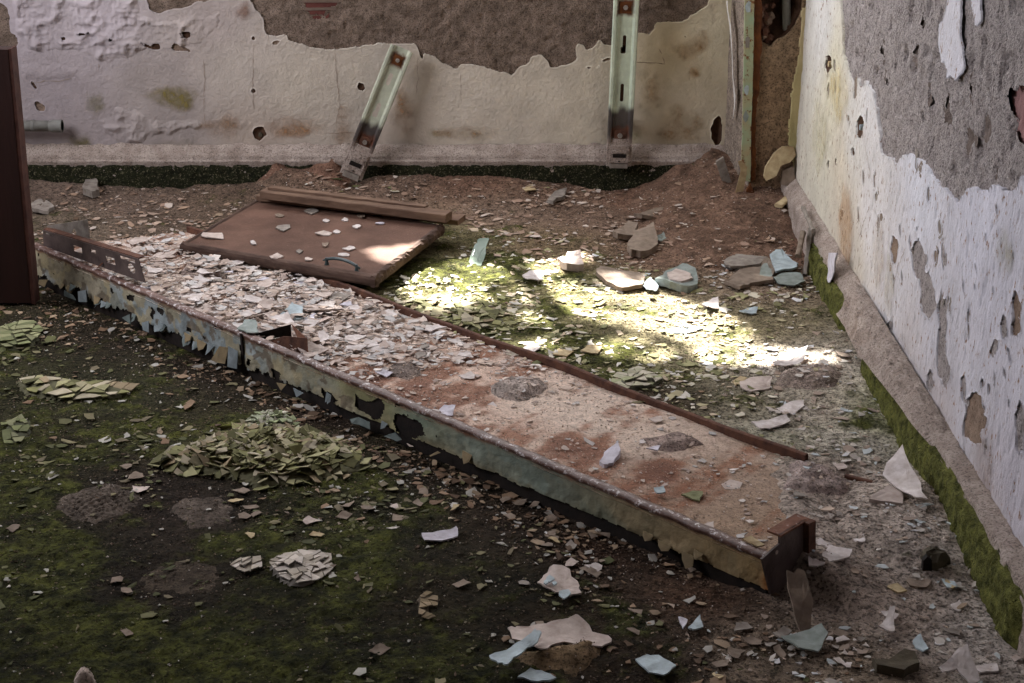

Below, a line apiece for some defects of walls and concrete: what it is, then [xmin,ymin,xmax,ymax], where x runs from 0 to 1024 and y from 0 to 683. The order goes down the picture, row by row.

peeling [638,0,709,34]
peeling [251,0,613,75]
peeling [826,0,1024,201]
peeling [522,270,543,281]
peeling [770,248,798,273]
peeling [121,236,474,378]
spalling [836,213,1005,449]
peeling [523,343,602,357]
peeling [732,376,773,392]
peeling [751,400,805,429]
peeling [422,526,458,542]
peeling [537,564,582,599]